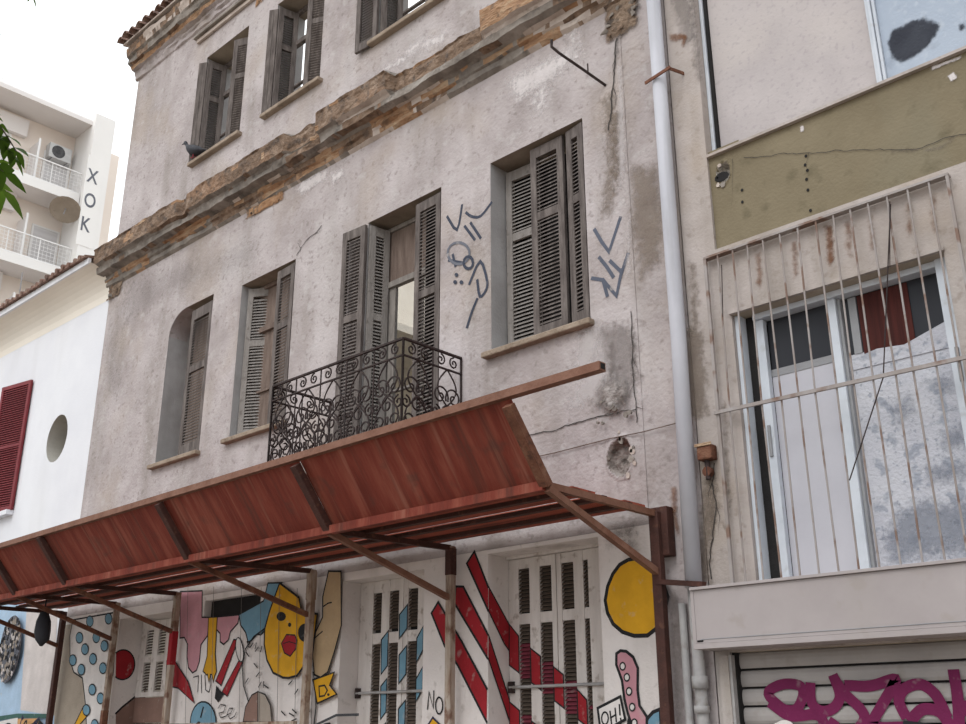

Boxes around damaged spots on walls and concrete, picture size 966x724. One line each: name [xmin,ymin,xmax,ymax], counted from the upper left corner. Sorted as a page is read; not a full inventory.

spalling [600,0,637,42]
peeling [385,32,447,69]
peeling [298,168,344,195]
crack [732,134,966,193]
spalling [246,191,283,219]
crack [530,311,642,435]
spalling [602,427,639,487]